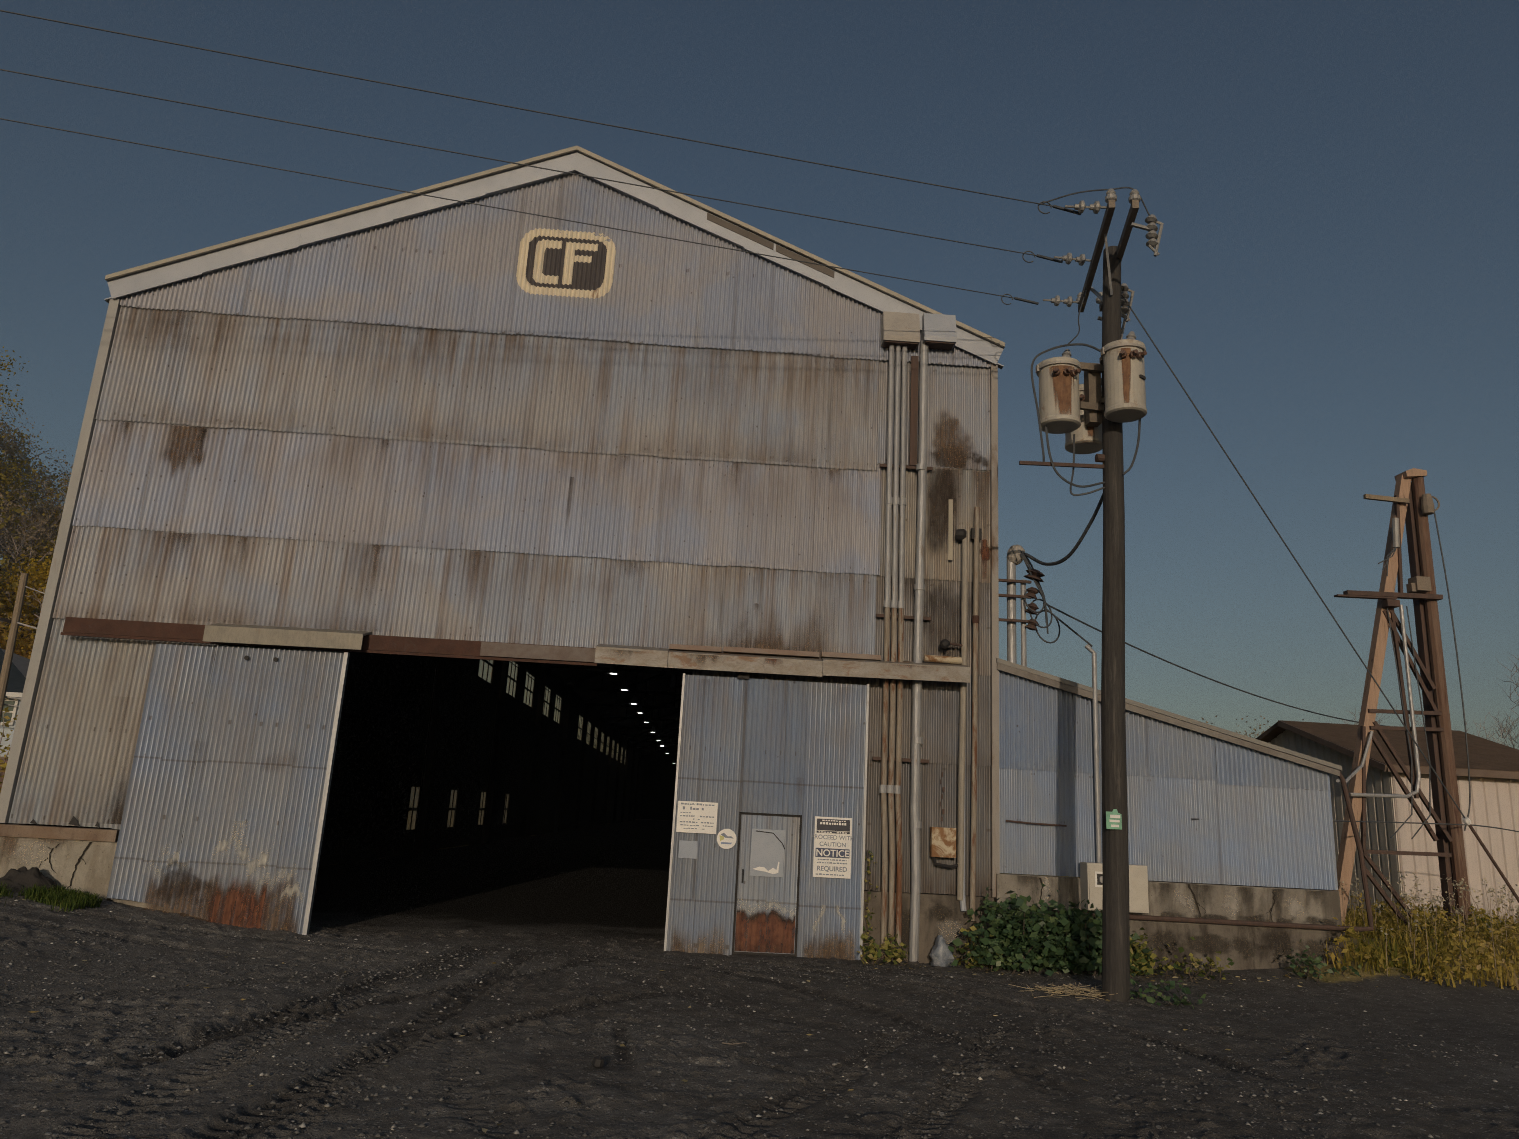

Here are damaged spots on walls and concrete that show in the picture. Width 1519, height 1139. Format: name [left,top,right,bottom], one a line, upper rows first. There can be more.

rust [168,425,206,472]
crack [38,842,92,888]
rust [208,842,299,933]
rust [674,905,853,960]